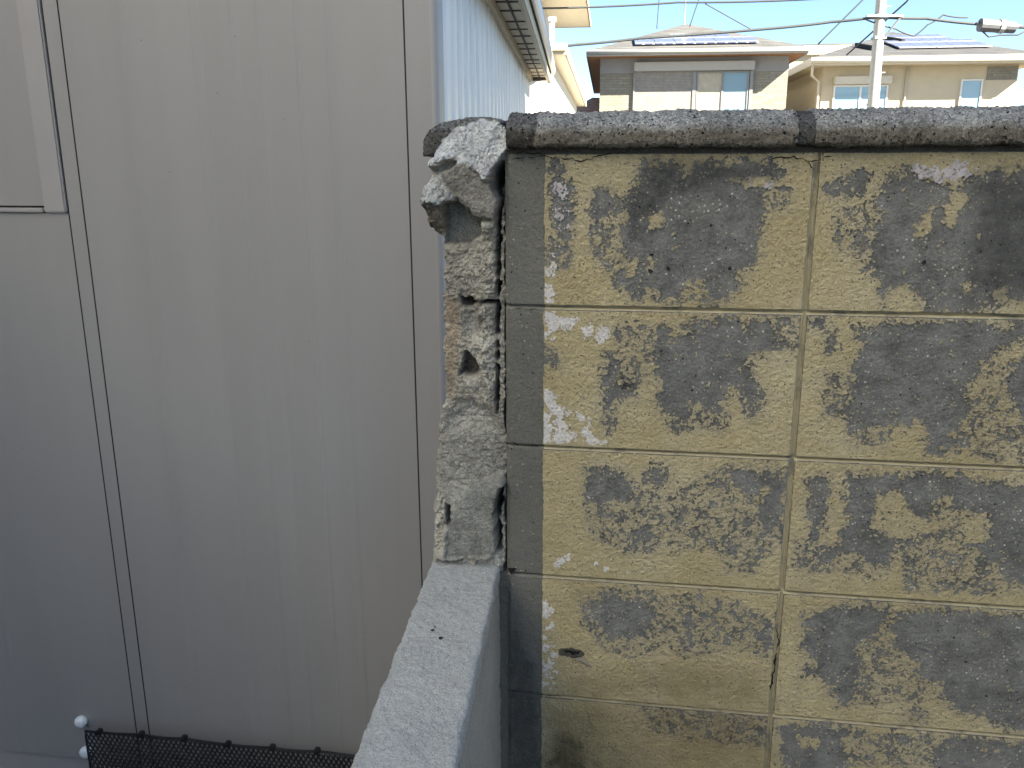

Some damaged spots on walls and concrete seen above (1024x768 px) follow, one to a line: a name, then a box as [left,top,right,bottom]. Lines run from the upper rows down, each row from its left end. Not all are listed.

spalling [430,160,457,179]
spalling [438,153,507,441]
peeling [545,154,1024,596]
spalling [430,470,507,571]
peeling [573,570,776,662]
crack [769,628,780,690]
peeling [642,600,1024,768]